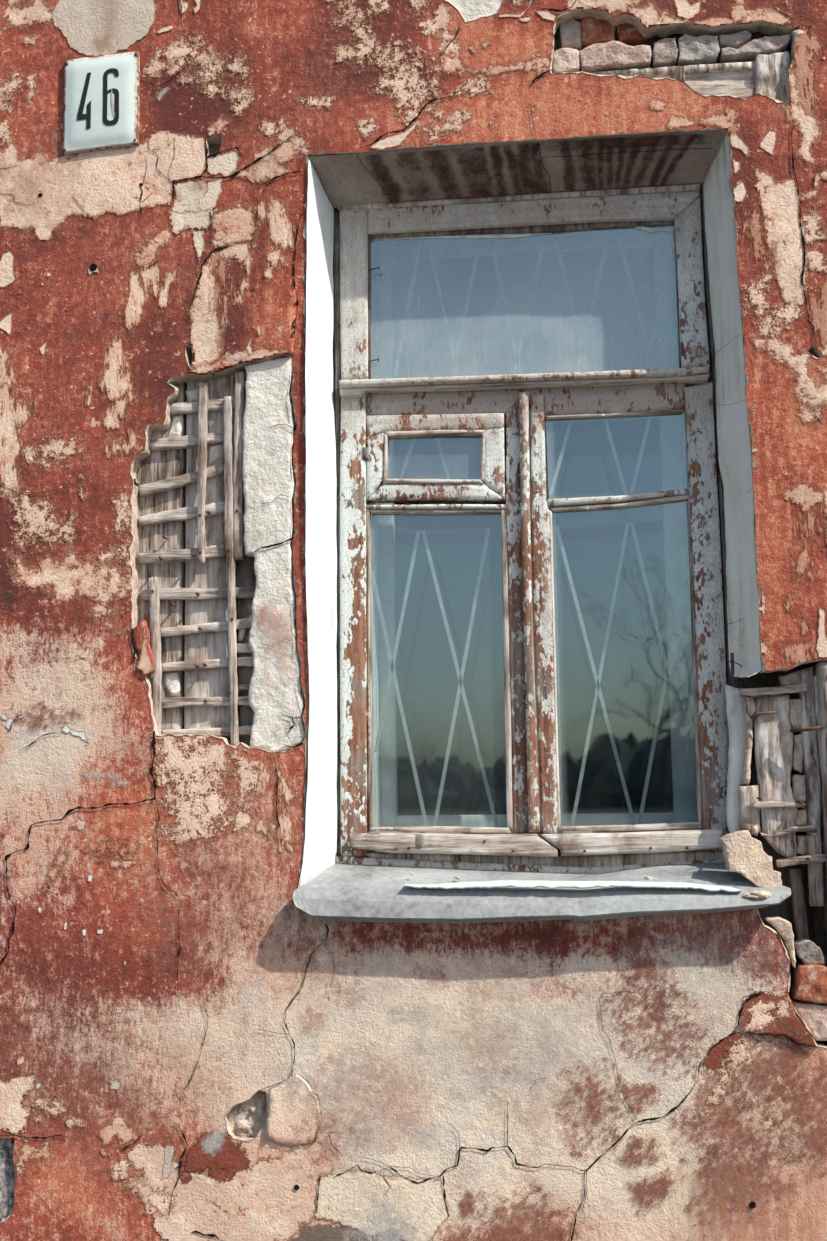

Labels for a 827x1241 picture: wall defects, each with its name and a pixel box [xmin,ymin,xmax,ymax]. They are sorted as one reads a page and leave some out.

crack [791,126,826,351]
peeling [0,0,827,887]
crack [10,715,54,751]
crack [0,731,223,1241]
peeling [0,1053,572,1241]
crack [258,924,818,1241]
peeling [556,945,827,1229]